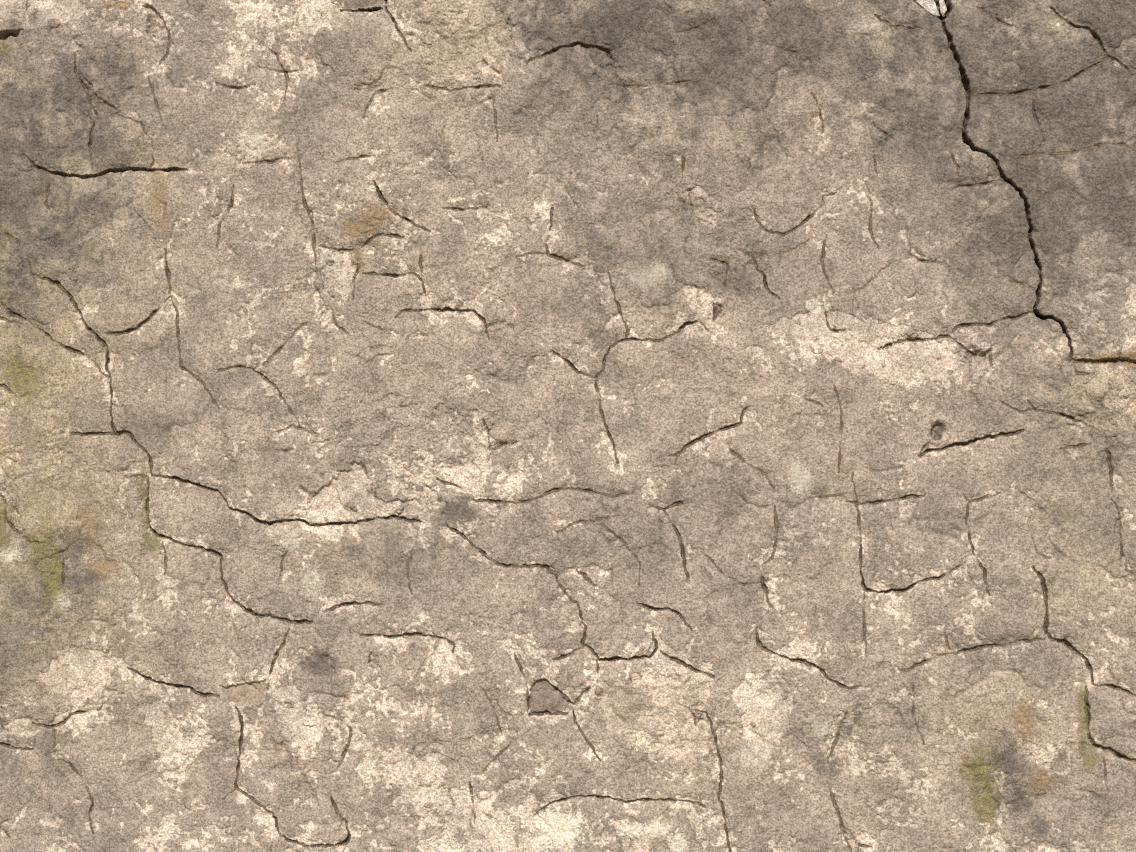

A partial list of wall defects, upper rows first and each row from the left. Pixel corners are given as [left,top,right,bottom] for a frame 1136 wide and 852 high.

crack [340,0,412,52]
crack [811,91,824,130]
crack [865,0,1136,375]
crack [0,28,779,834]
crack [516,191,846,464]
crack [805,384,1001,654]
crack [918,400,1136,575]
crack [127,667,351,852]
crack [537,709,732,852]
crack [755,631,873,852]
crack [904,543,1136,791]
crack [1005,792,1046,804]